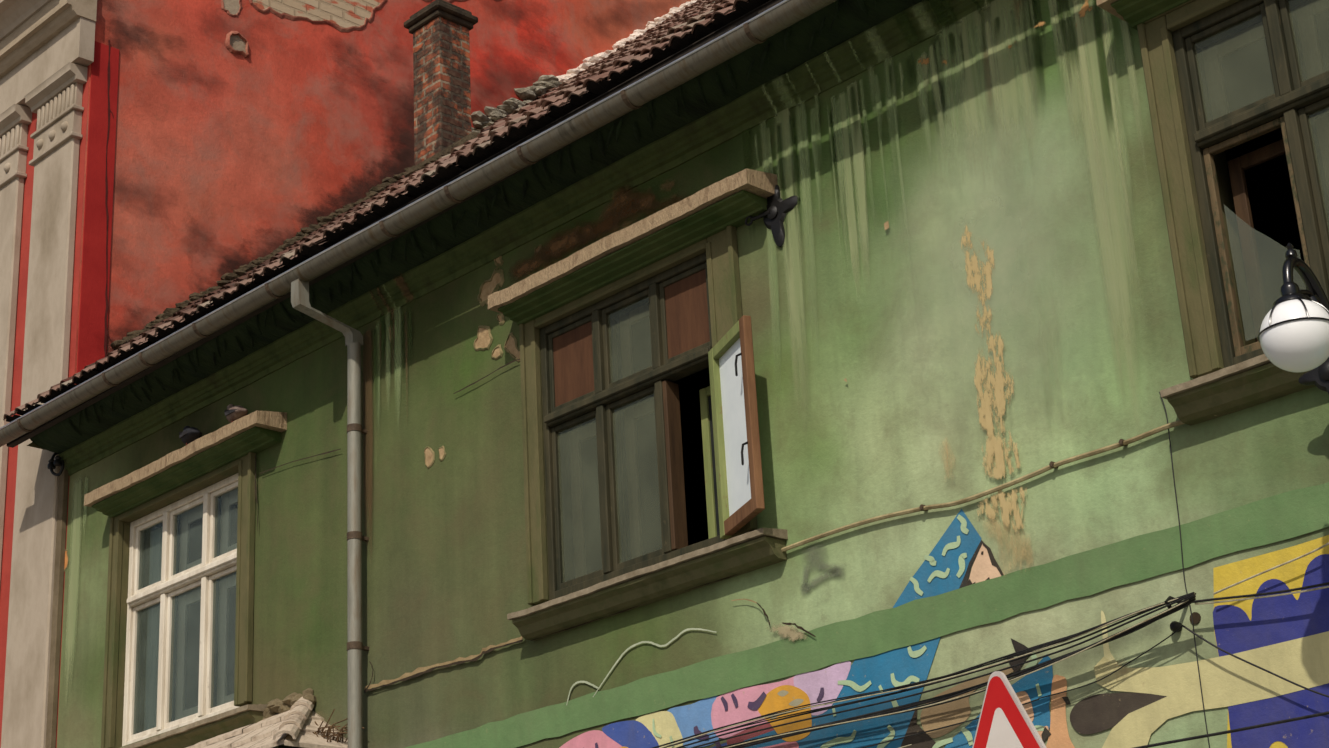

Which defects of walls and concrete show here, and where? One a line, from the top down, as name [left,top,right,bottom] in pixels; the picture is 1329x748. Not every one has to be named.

flaking render [221,0,387,58]
damp [743,0,1135,351]
flaking render [473,256,520,362]
peeling [961,225,1027,555]
flaking render [424,446,446,469]